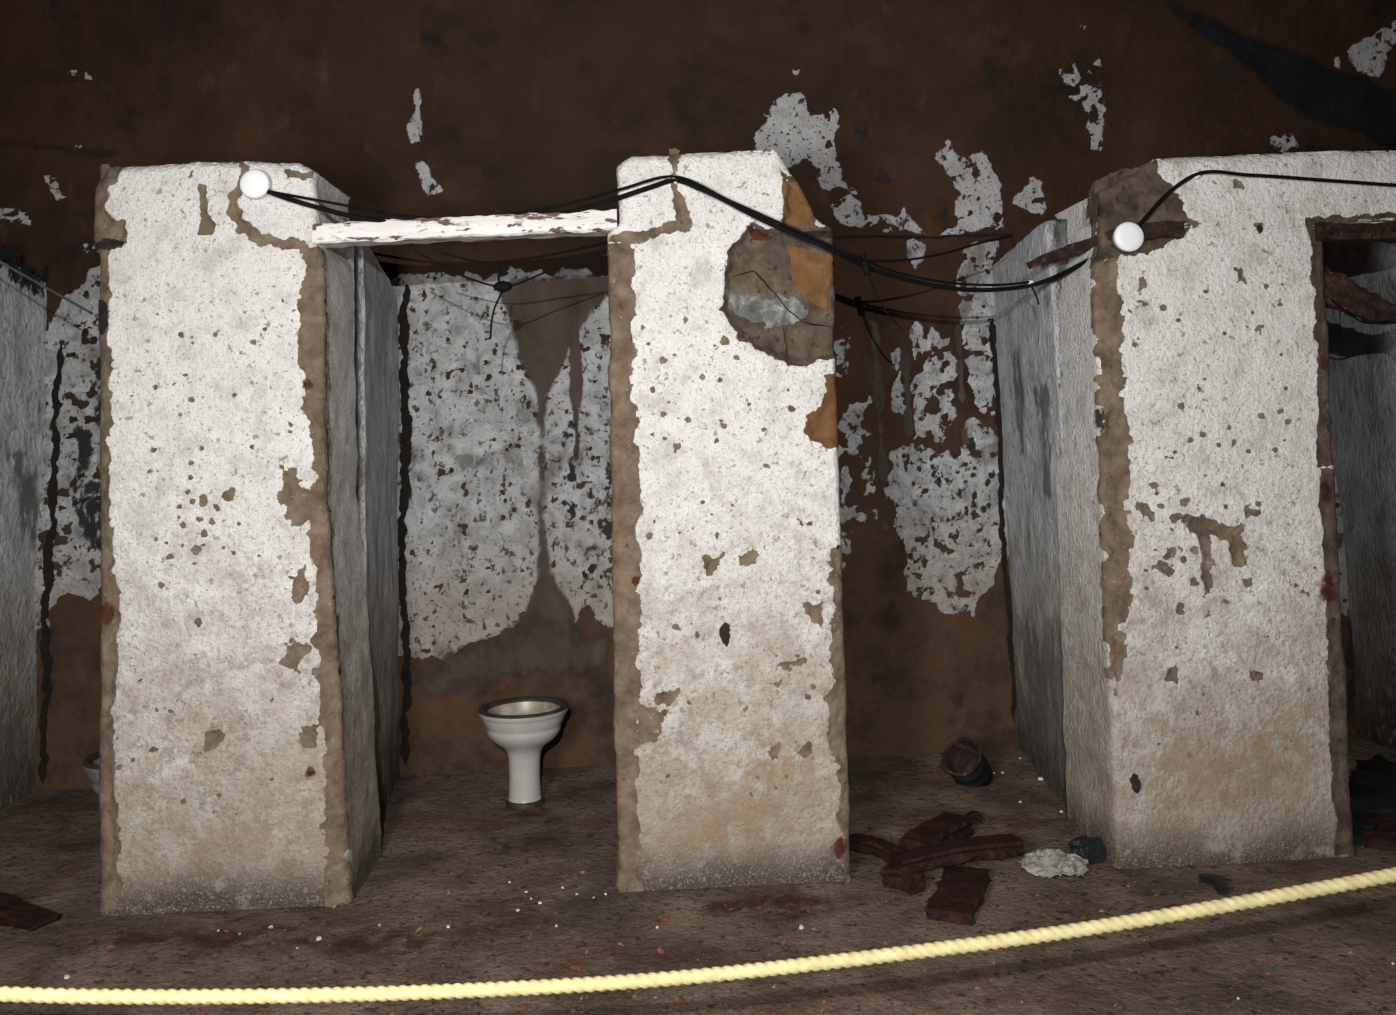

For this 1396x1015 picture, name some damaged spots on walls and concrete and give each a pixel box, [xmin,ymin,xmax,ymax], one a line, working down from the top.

peeling [407,88,422,143]
damp [1172,4,1396,150]
peeling [1270,135,1299,153]
peeling [1334,21,1396,77]
peeling [35,164,159,912]
flaking render [188,161,353,908]
peeling [389,148,693,893]
flaking render [702,532,759,576]
flaking render [713,92,1047,883]
flaking render [1086,160,1263,696]
flaking render [1258,408,1291,453]